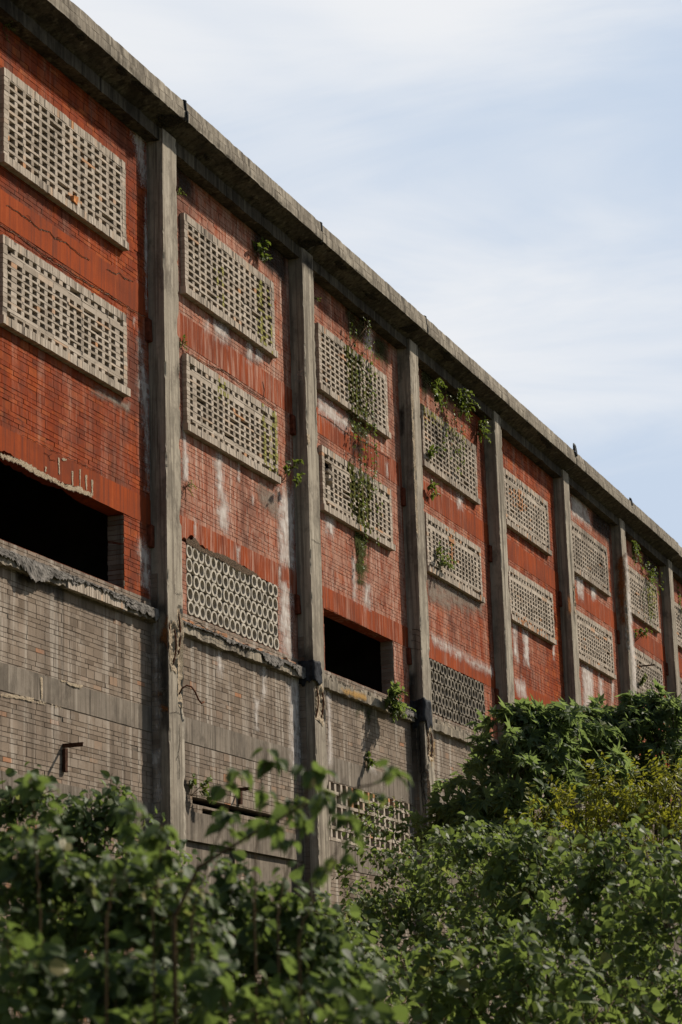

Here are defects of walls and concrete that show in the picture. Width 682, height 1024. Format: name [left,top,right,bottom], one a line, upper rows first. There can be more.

crack [0,205,145,316]
spalling [1,453,93,497]
water stain [217,456,227,527]